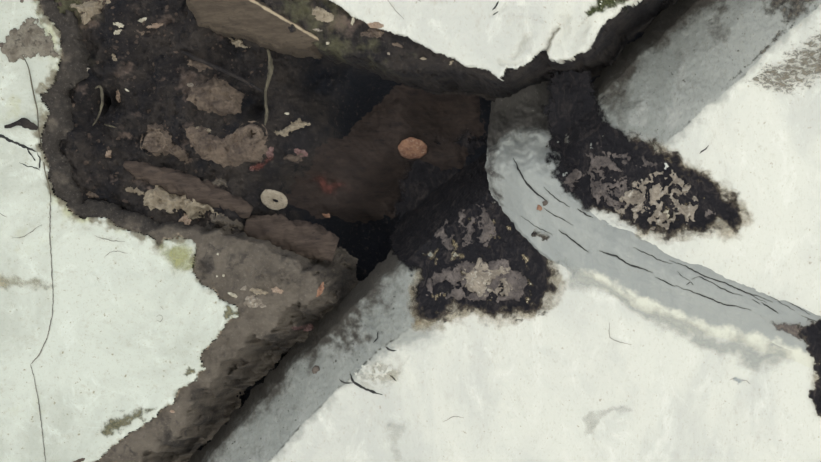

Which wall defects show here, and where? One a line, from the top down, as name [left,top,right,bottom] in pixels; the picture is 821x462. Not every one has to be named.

peeling [1,17,60,63]
spalling [38,0,678,462]
crack [513,158,816,322]
crack [339,374,396,395]